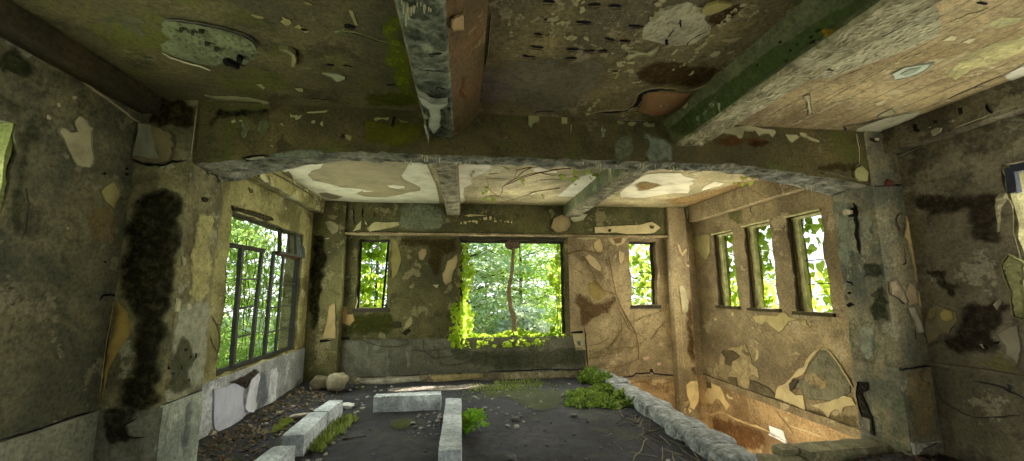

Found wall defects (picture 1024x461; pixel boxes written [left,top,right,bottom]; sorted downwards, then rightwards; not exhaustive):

flaking render [160,19,258,71]
flaking render [599,0,747,84]
peeling [241,145,440,204]
crack [819,118,927,255]
flaking render [551,214,660,272]
water stain [104,189,214,446]
peeling [208,369,260,436]
mould [309,236,327,330]
crack [623,313,685,390]
flaking render [686,312,876,443]
water stain [946,303,1014,371]
crack [973,381,1023,398]